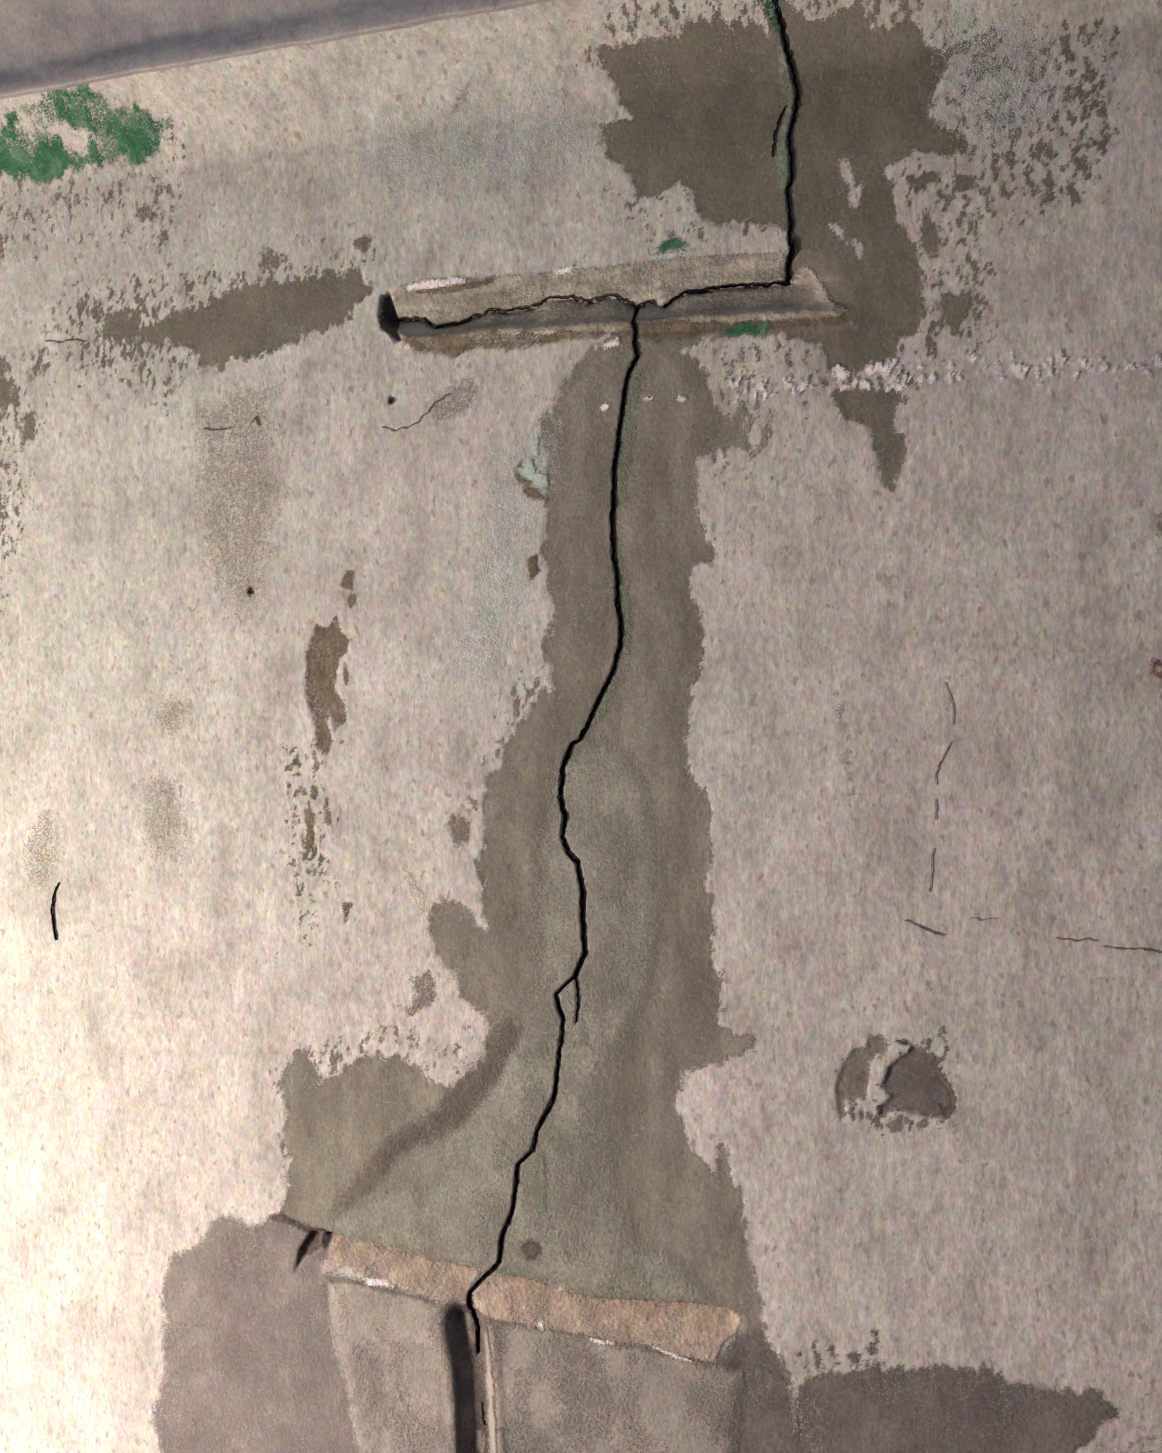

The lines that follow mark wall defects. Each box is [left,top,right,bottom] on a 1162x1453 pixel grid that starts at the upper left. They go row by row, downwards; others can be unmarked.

flaking render [0,133,382,612]
crack [382,394,450,432]
crack [397,0,799,1354]
flaking render [267,0,1122,1385]
peeling [474,1429,486,1453]
leakage [148,1211,1162,1453]